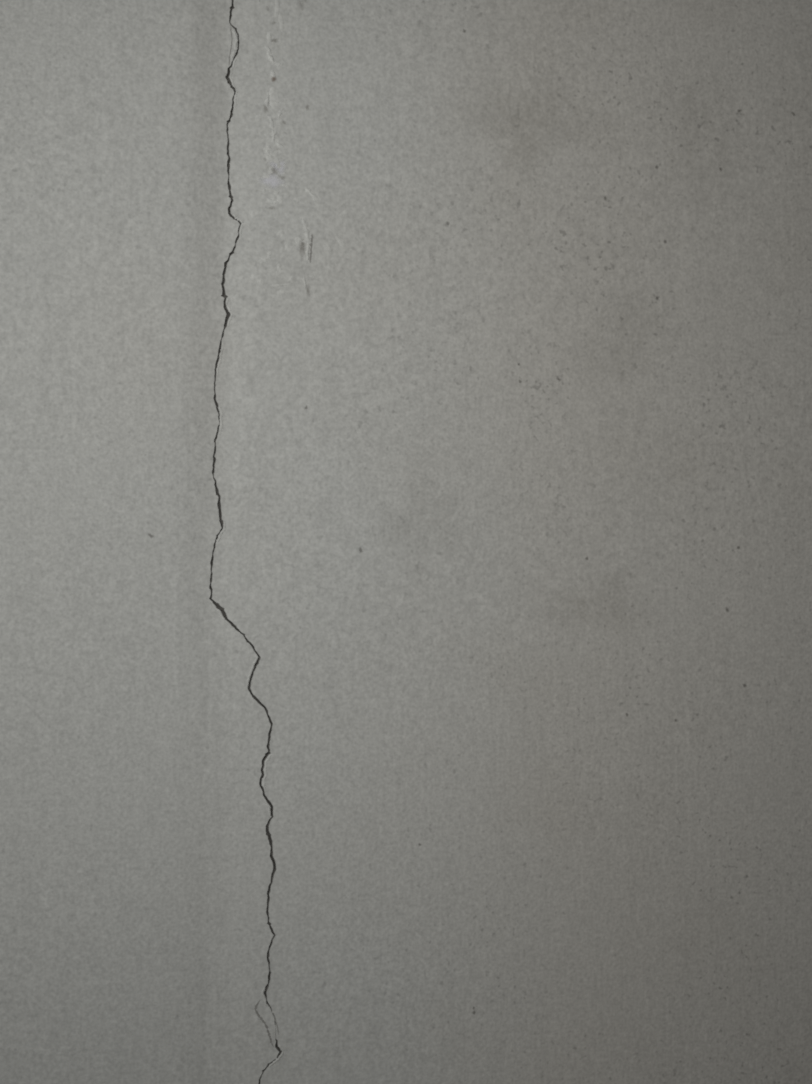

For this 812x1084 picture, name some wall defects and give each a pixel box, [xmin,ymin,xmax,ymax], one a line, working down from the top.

crack [209,0,284,1084]